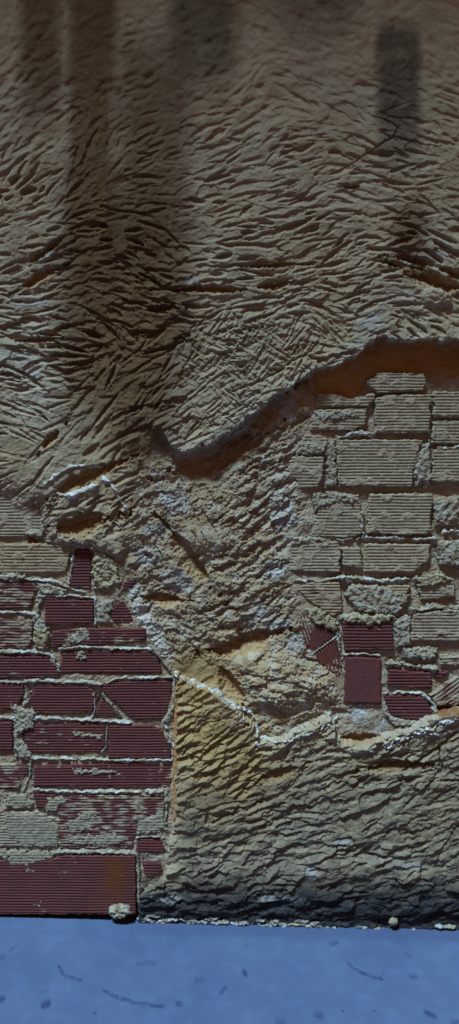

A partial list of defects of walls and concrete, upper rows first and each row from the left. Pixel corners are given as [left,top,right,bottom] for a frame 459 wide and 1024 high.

spalling [0,336,459,929]
flaking render [433,923,456,931]